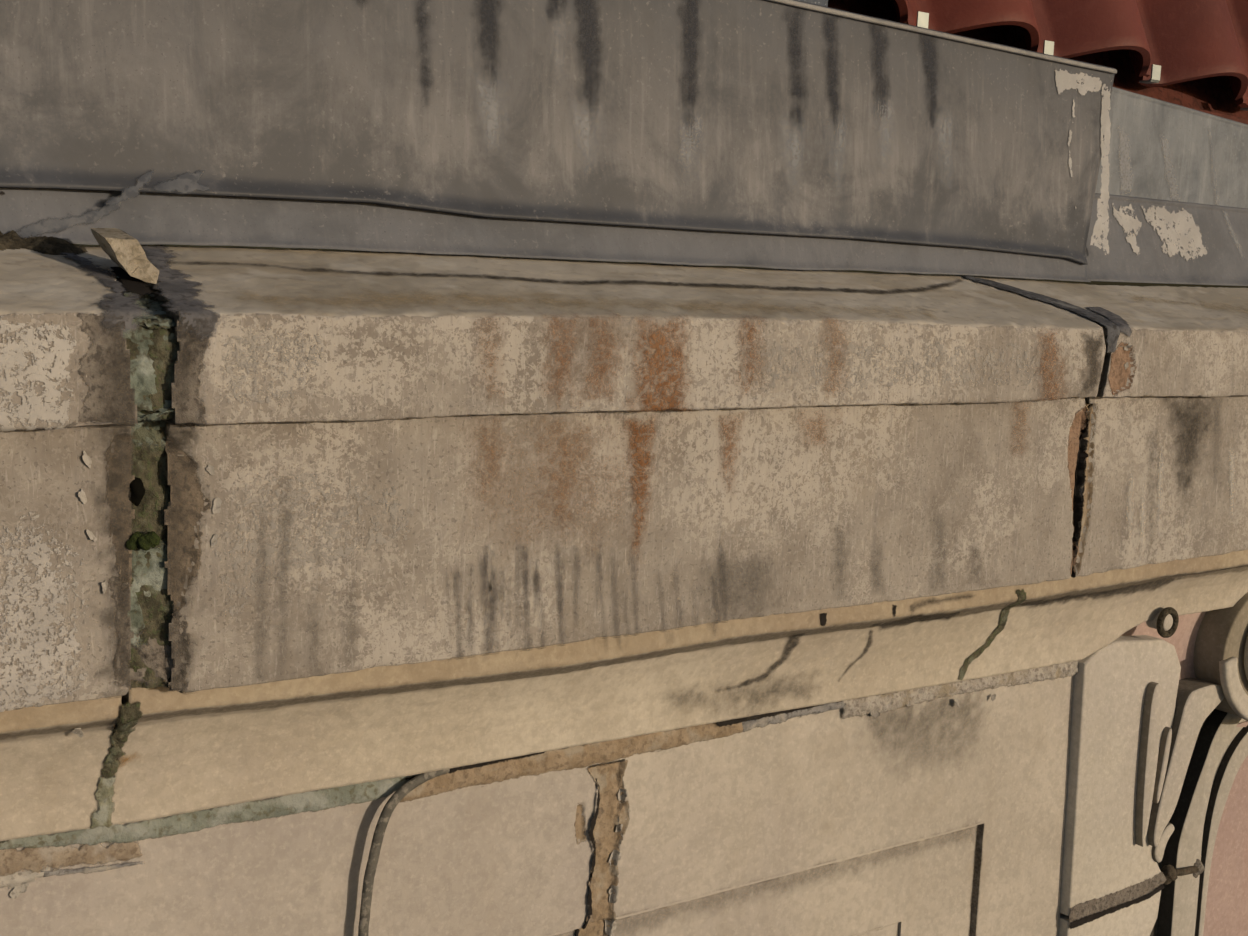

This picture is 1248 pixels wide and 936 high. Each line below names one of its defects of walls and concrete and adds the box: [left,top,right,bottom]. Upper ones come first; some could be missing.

water stain [549,0,600,147]
water stain [683,0,699,104]
water stain [825,15,843,171]
water stain [921,34,951,165]
peeling [1055,69,1208,262]
rust [630,323,685,545]
crack [1067,404,1098,578]
crack [727,613,827,696]
crack [844,596,971,674]
crack [958,589,1026,680]
crack [91,702,142,829]
peeling [0,867,50,889]